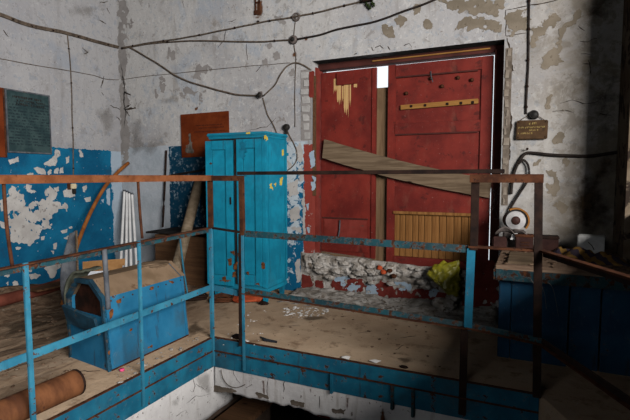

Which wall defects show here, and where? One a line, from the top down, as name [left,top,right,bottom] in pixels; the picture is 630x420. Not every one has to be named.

flaking render [382,15,407,38]
flaking render [438,0,582,70]
crack [101,70,136,124]
peeling [27,149,69,175]
flaking render [287,68,316,234]
flaking render [552,132,565,144]
peeling [0,184,75,250]
flaking render [546,169,569,214]
spalling [295,252,466,313]
peeling [473,258,499,309]